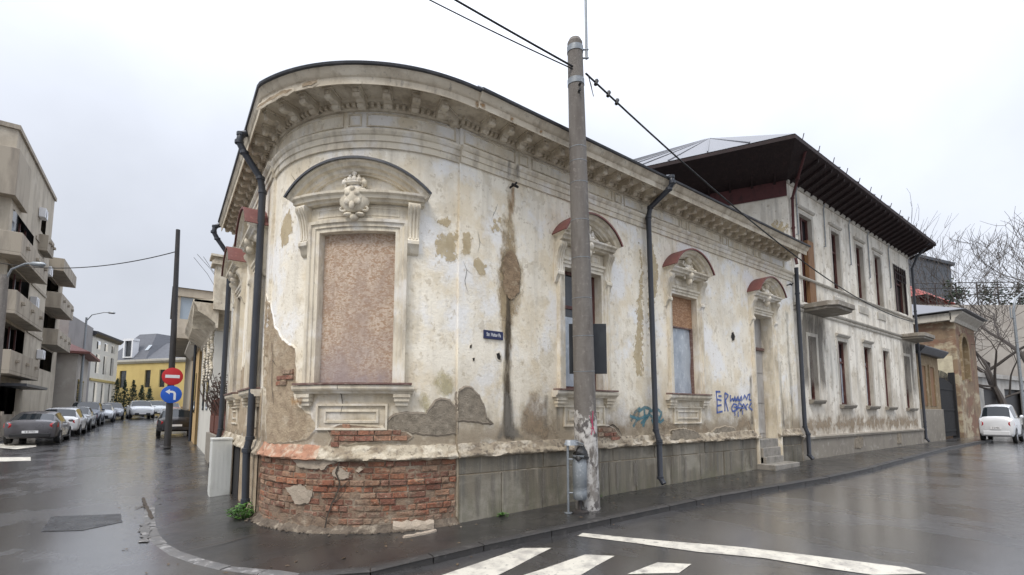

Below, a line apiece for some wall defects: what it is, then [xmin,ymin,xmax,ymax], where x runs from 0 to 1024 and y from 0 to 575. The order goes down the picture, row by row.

peeling [281,209,293,247]
peeling [435,216,487,275]
spalling [227,293,494,448]
water stain [500,296,549,439]